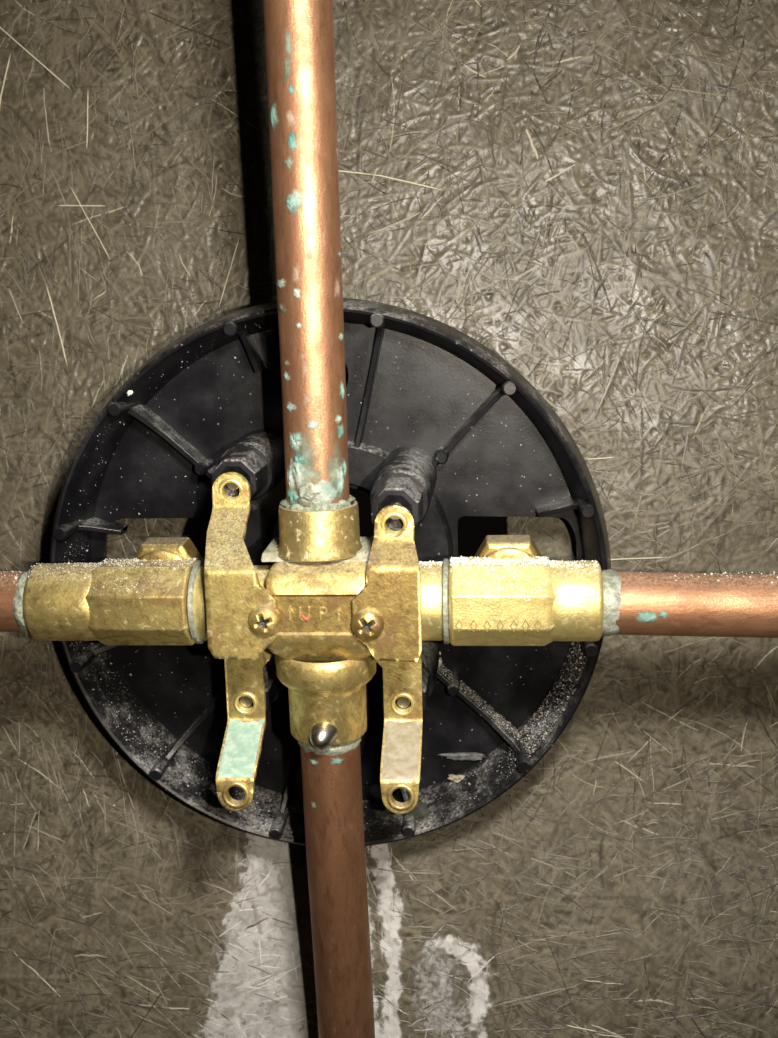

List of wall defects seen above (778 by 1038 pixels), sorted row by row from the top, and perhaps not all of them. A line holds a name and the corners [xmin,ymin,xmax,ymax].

leakage [192,832,319,1038]
leakage [366,842,499,1038]